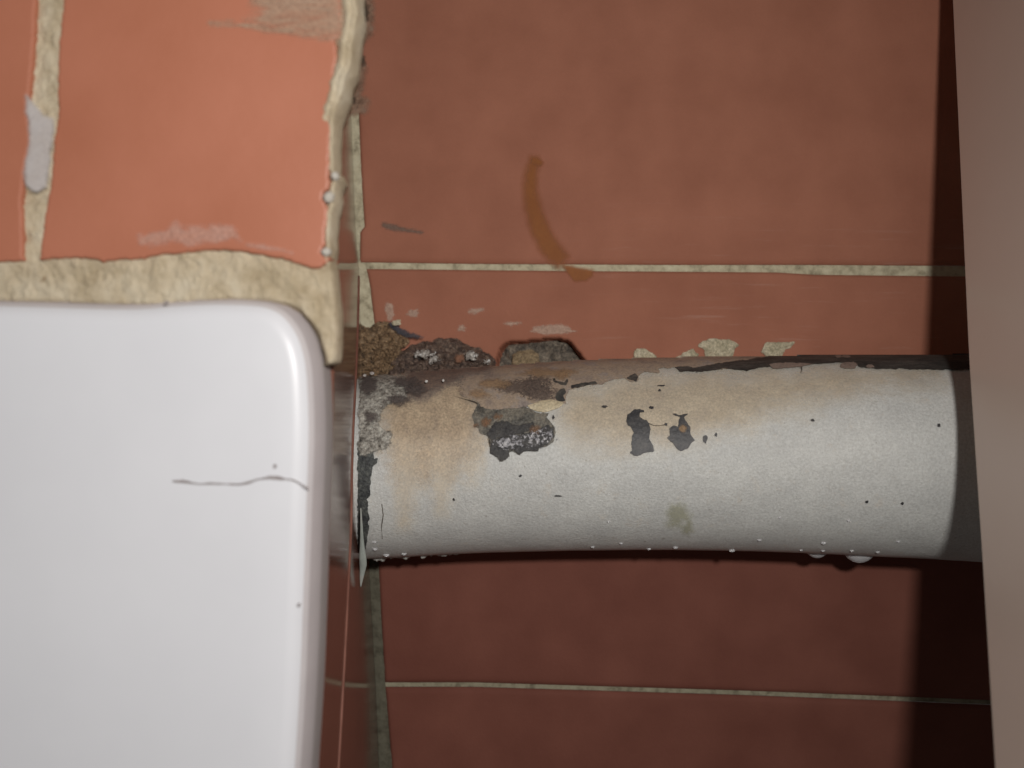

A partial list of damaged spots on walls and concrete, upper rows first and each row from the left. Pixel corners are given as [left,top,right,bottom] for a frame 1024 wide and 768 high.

corrosion [524,158,593,281]
corrosion [379,366,558,478]
peeling [626,406,717,456]
peeling [456,338,970,419]
peeling [357,448,378,550]